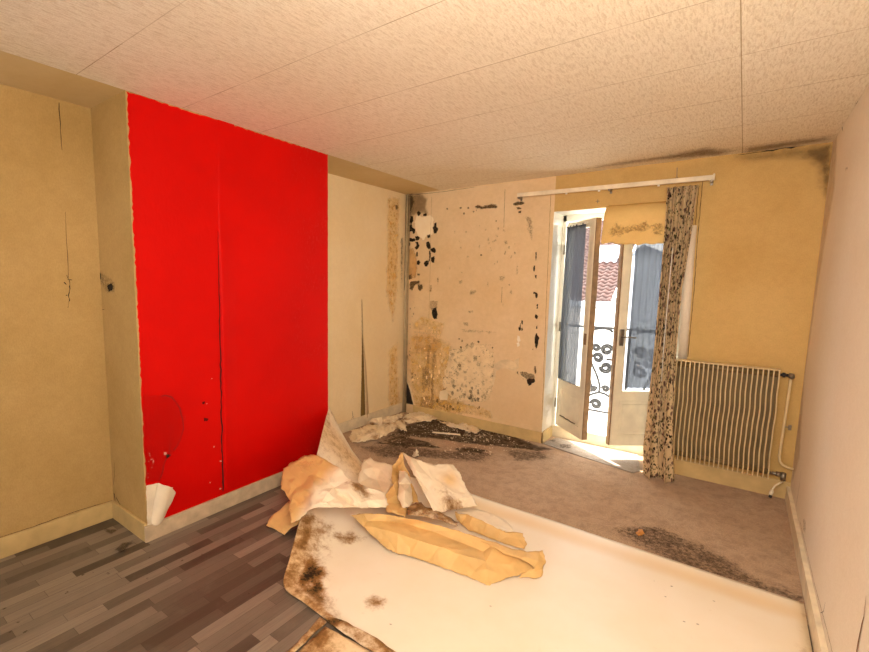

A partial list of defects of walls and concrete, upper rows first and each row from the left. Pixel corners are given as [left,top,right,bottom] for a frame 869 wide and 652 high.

water stain [362,419,548,462]